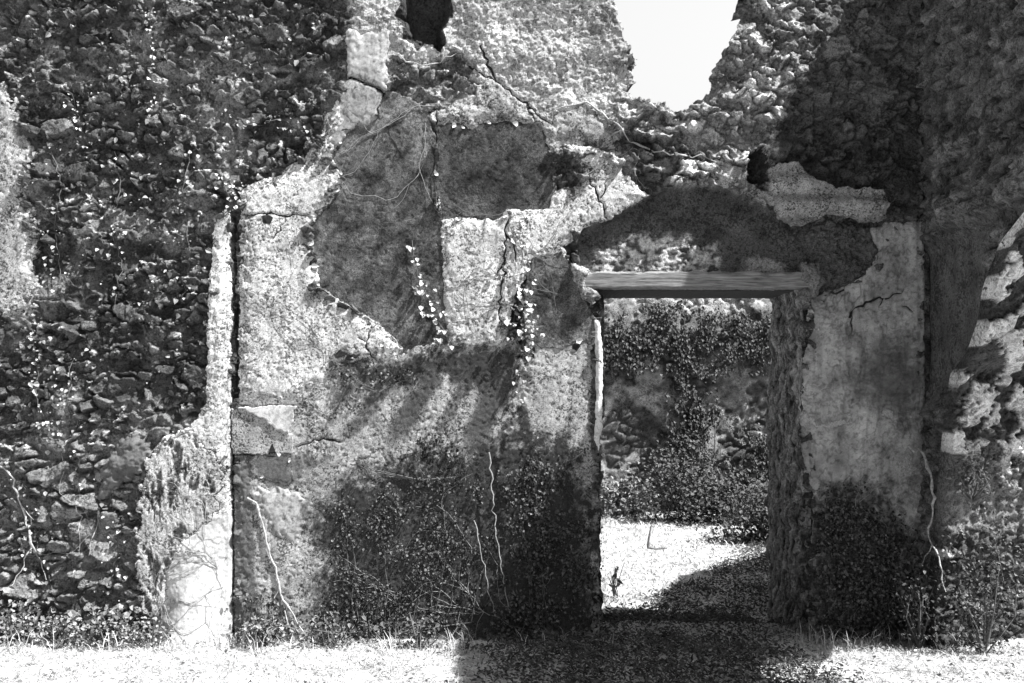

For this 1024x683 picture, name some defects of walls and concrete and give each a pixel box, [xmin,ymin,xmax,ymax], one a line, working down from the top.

crack [467,45,551,126]
crack [497,213,516,330]
crack [849,290,913,334]